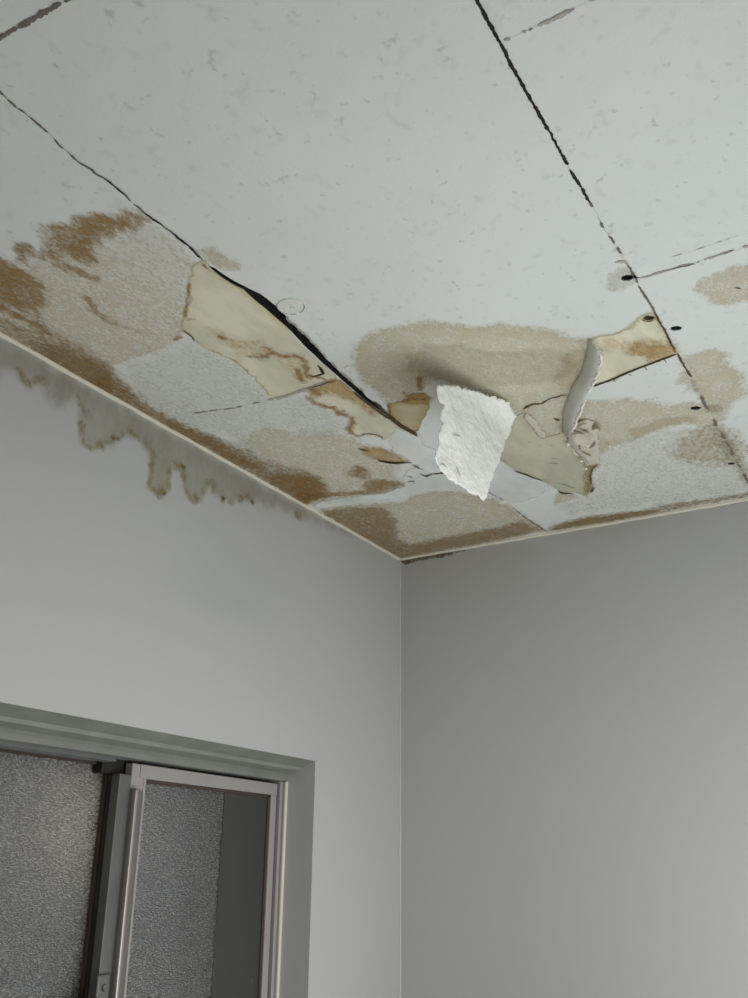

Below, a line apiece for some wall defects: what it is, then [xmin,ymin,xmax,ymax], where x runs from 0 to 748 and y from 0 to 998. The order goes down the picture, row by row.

crack [0,0,71,41]
crack [0,91,203,260]
crack [475,0,748,483]
damp [0,212,181,388]
crack [193,381,329,414]
peeling [173,261,467,509]
damp [356,322,586,437]
peeling [591,313,676,385]
damp [578,350,747,448]
damp [244,429,541,558]
peeling [487,413,599,503]